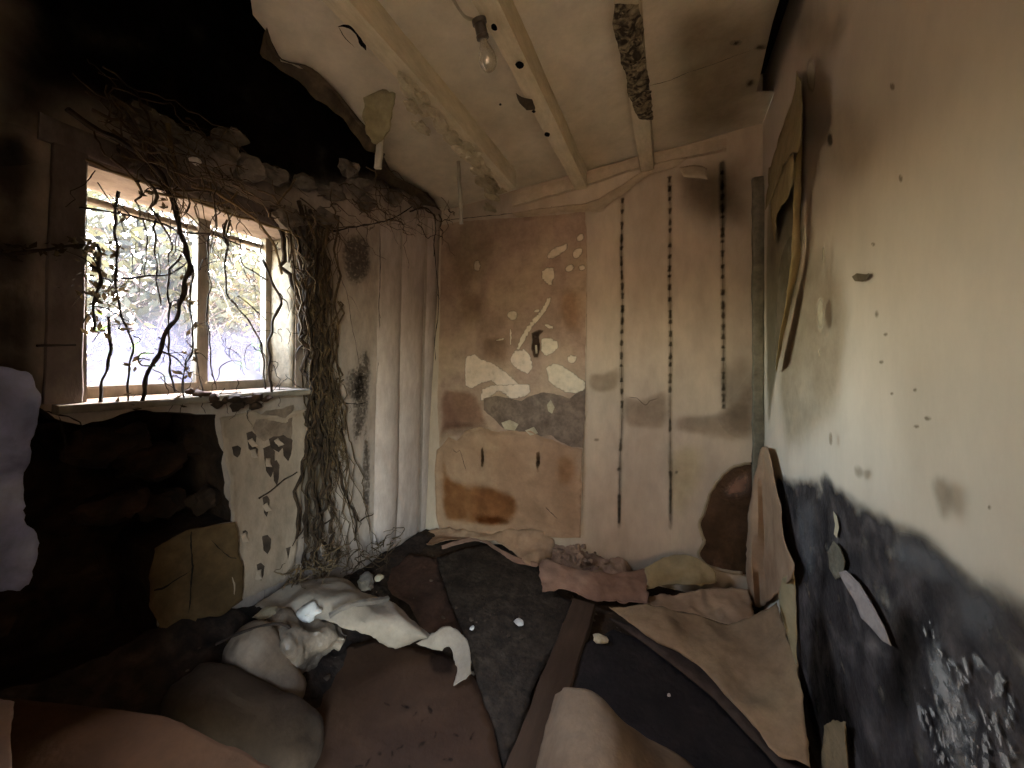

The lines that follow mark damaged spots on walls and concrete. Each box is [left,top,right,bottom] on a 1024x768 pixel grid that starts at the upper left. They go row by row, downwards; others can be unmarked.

crack [338,24,366,50]
peeling [362,89,395,145]
peeling [612,3,654,120]
flaking render [437,212,587,448]
leakage [349,352,369,506]
spalling [0,405,311,691]
leakage [776,477,1024,768]